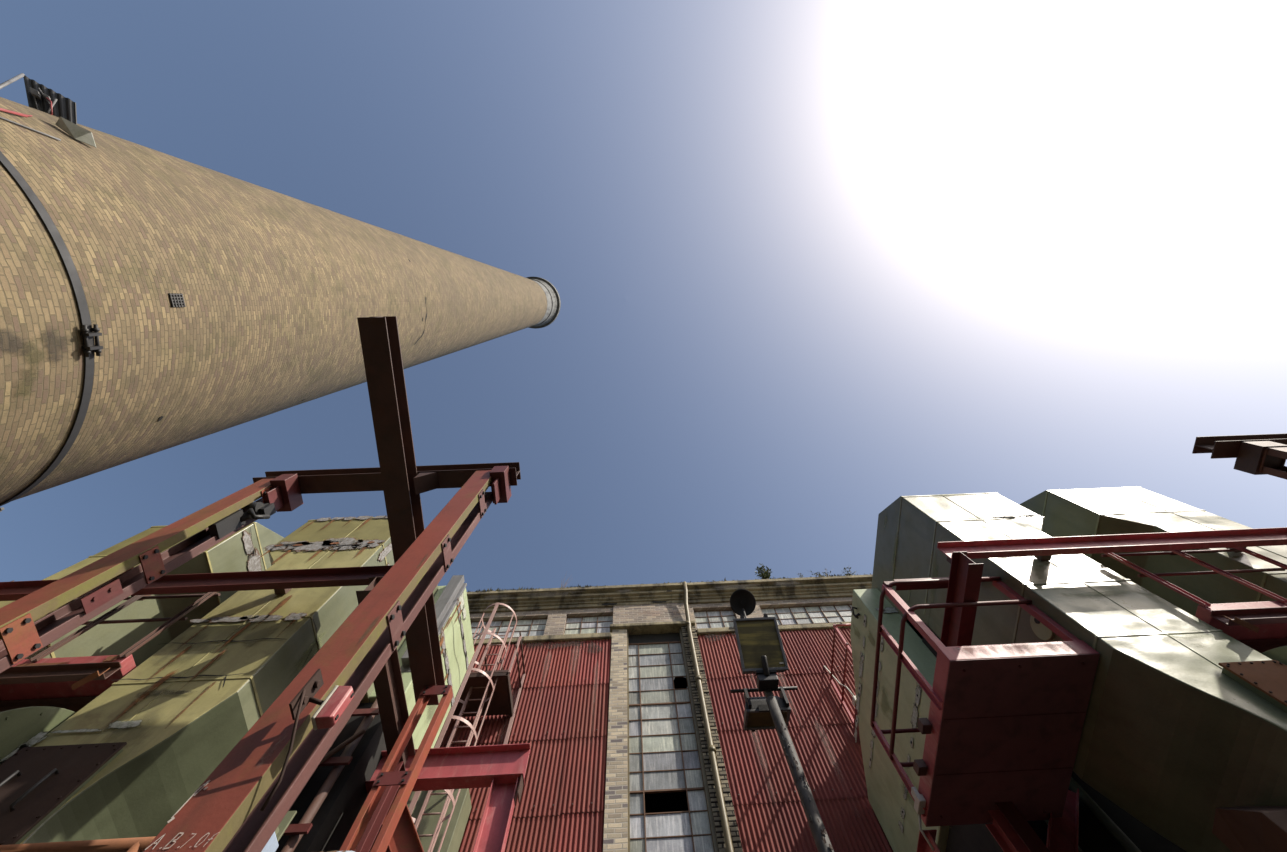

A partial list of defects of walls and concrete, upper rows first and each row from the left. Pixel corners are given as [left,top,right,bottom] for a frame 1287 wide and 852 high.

peeling [242,515,392,571]
rust [108,645,192,725]
rust [170,650,226,724]